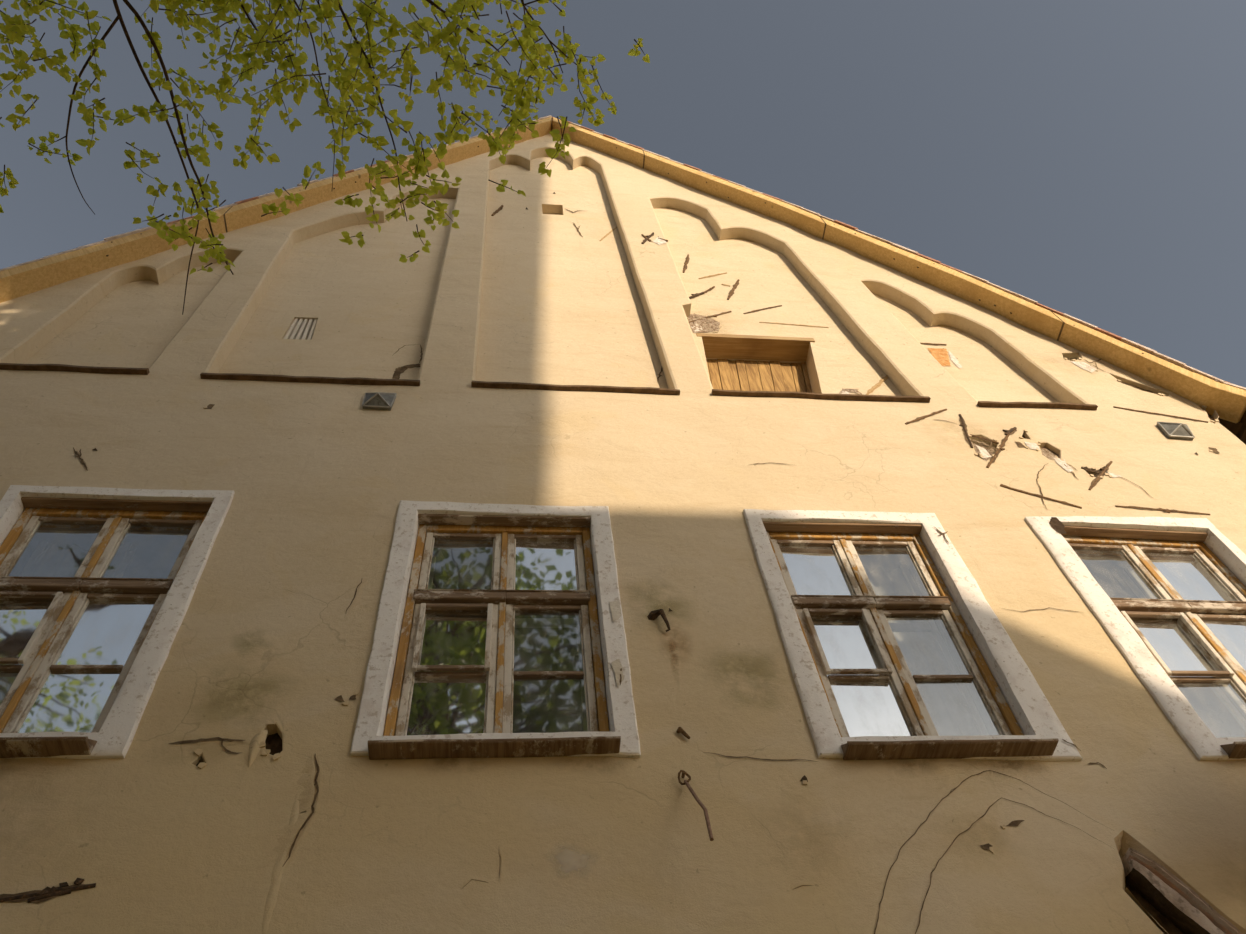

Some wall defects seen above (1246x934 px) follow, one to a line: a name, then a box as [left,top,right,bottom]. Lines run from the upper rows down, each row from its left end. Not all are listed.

spalling [968,434,999,461]
spalling [1016,429,1073,472]
spalling [259,719,283,761]
crack [273,754,323,868]
crack [874,770,1114,934]